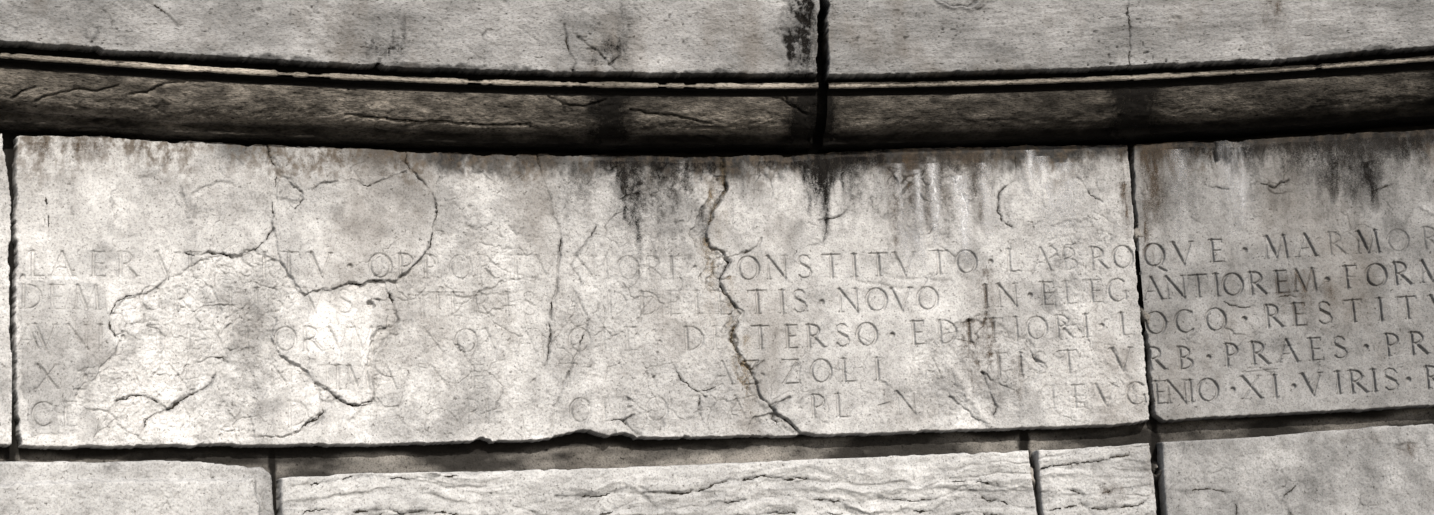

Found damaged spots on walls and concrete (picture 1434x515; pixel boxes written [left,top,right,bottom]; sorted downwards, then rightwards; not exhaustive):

crack [186,145,302,258]
crack [363,116,529,248]
crack [708,158,726,225]
water stain [573,96,969,252]
water stain [1027,150,1069,201]
water stain [1173,131,1434,200]
crack [108,295,132,337]
crack [676,251,796,430]
crack [116,393,194,427]
crack [302,397,371,427]